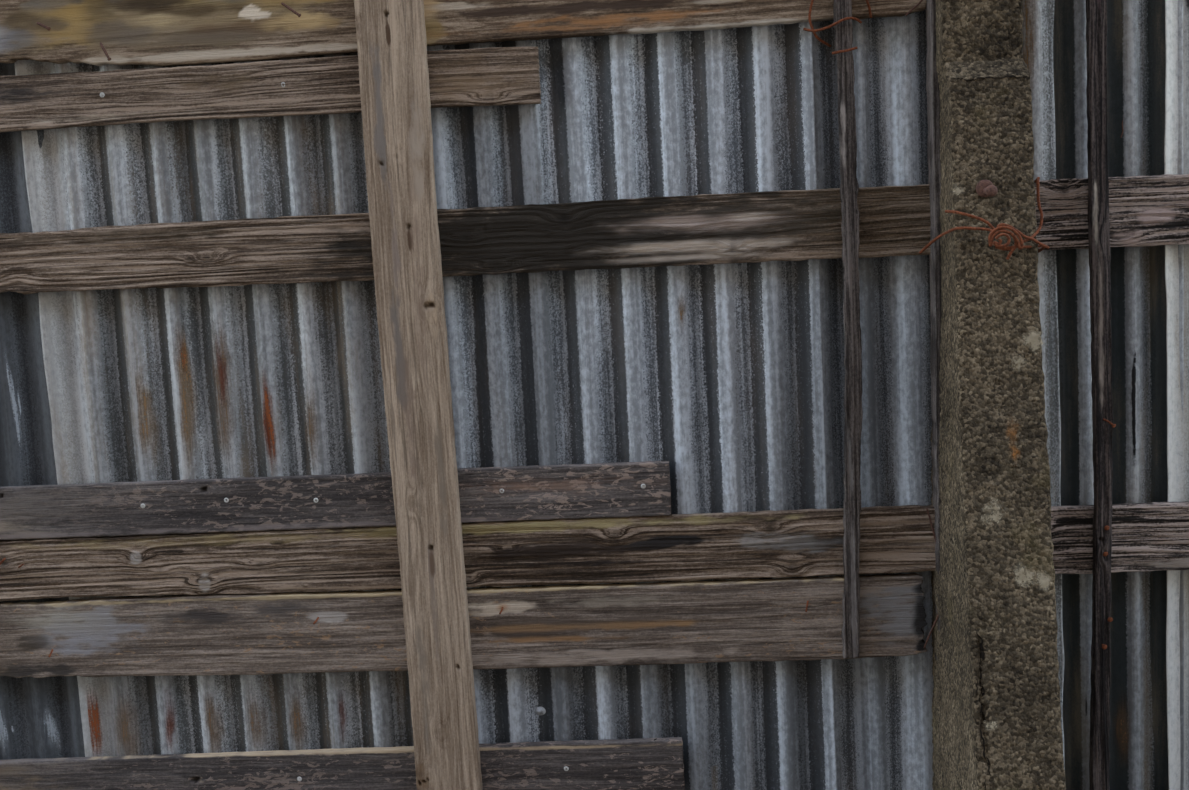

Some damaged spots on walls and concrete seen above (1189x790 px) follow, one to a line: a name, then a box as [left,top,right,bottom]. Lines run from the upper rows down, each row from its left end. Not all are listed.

corrosion [177,338,194,453]
corrosion [213,335,232,450]
corrosion [263,385,275,461]
corrosion [87,696,102,757]